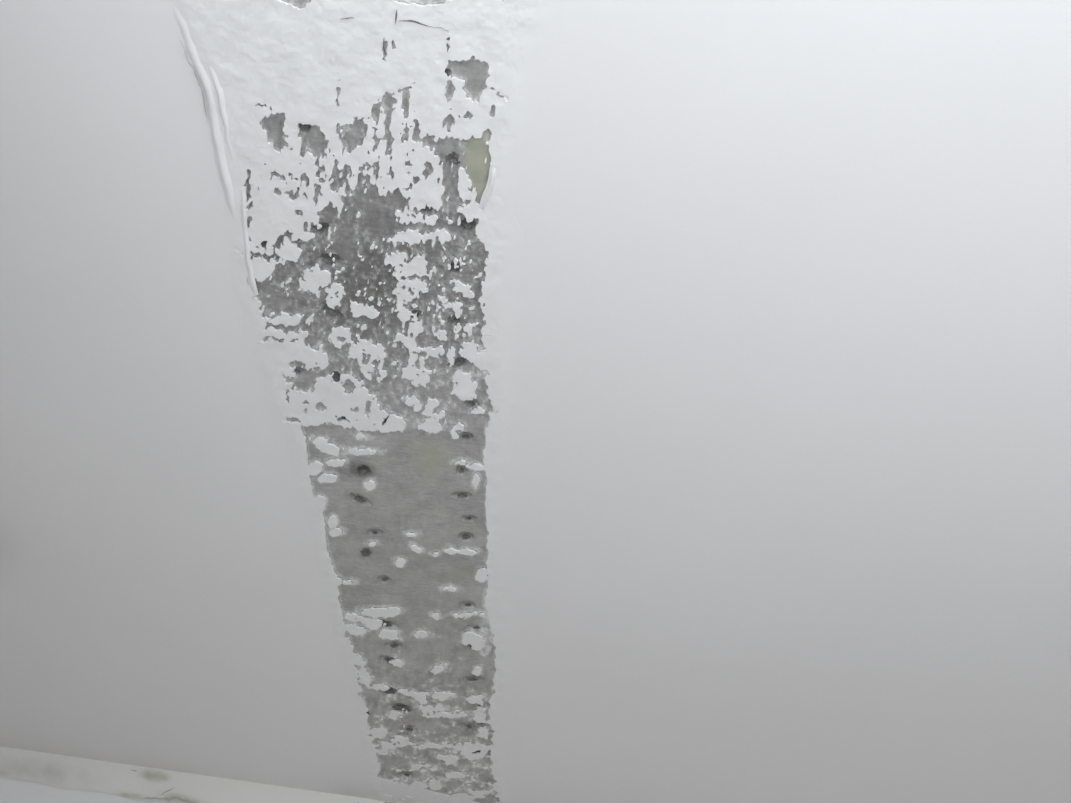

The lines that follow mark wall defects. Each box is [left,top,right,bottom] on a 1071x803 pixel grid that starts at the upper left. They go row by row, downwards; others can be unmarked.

flaking render [170,0,562,803]